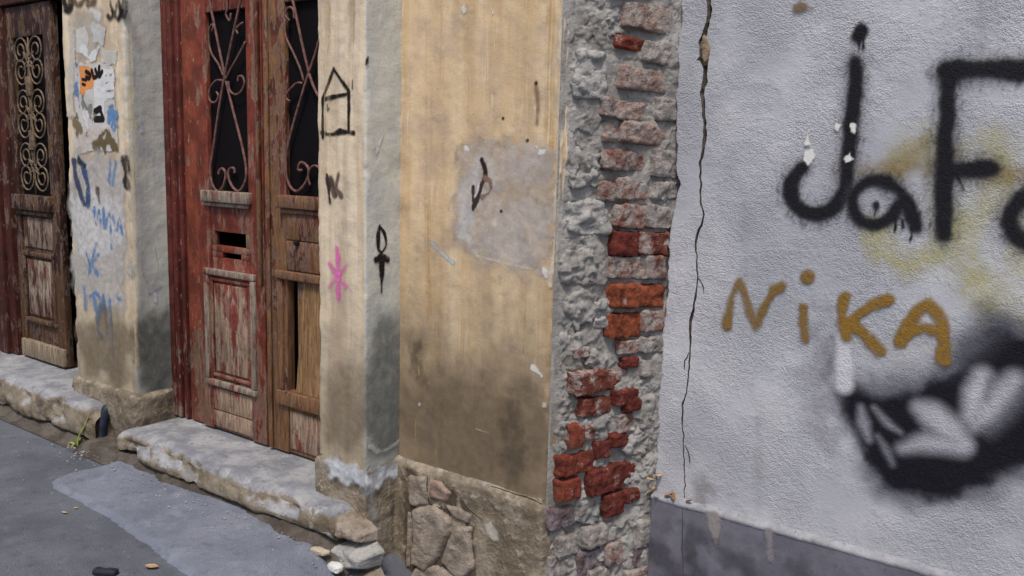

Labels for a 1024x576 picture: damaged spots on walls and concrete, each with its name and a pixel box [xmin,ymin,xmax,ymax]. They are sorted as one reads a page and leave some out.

spalling [453,0,683,576]
crack [681,0,712,558]
peeling [803,130,816,165]